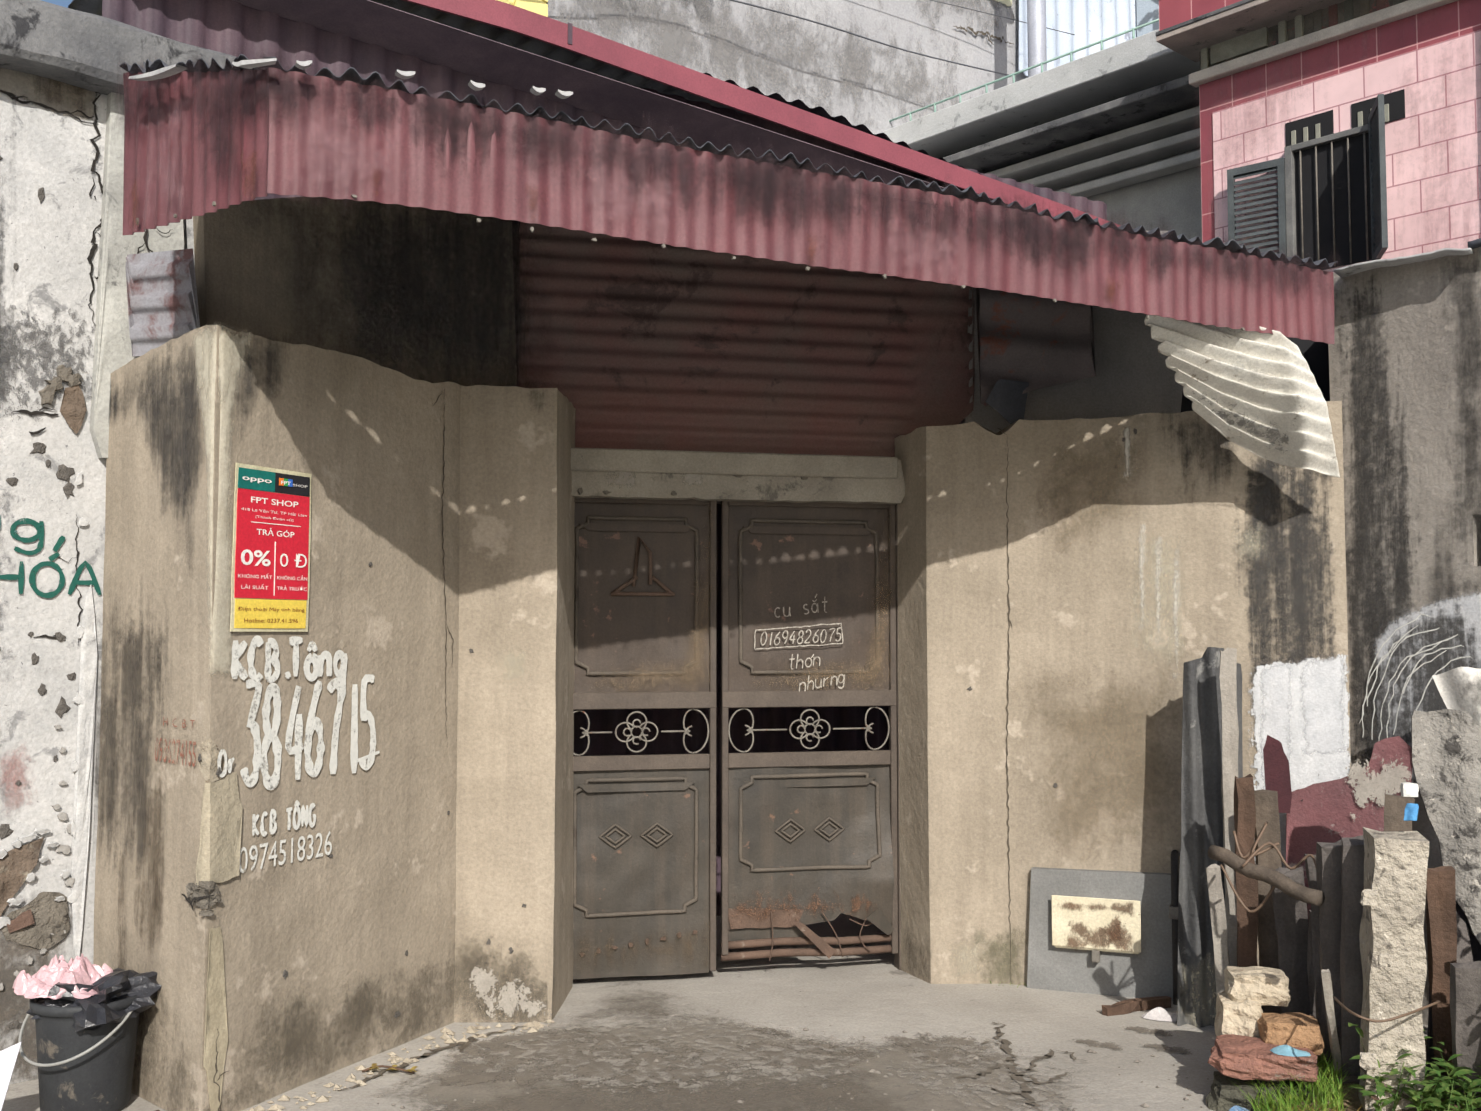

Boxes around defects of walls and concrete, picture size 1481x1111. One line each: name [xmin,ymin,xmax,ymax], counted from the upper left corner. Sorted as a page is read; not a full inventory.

damp [0,207,95,420]
crack [0,90,103,326]
crack [137,229,170,254]
damp [153,329,250,673]
damp [1193,277,1420,766]
flaking render [0,585,97,991]
damp [95,618,163,938]